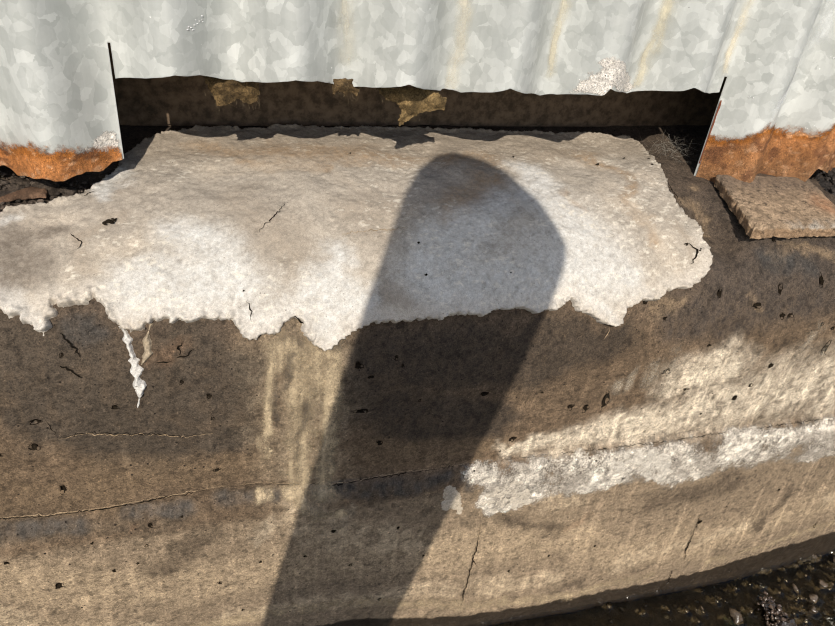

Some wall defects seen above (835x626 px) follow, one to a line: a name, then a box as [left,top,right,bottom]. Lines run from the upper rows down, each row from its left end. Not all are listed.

corrosion [0,141,122,182]
corrosion [696,100,835,184]
peeling [0,124,713,408]
crack [60,333,82,378]
crack [157,343,192,363]
crack [48,424,213,439]
leakage [255,338,341,515]
crack [0,431,726,519]
leakage [463,417,835,518]
crack [461,528,481,605]